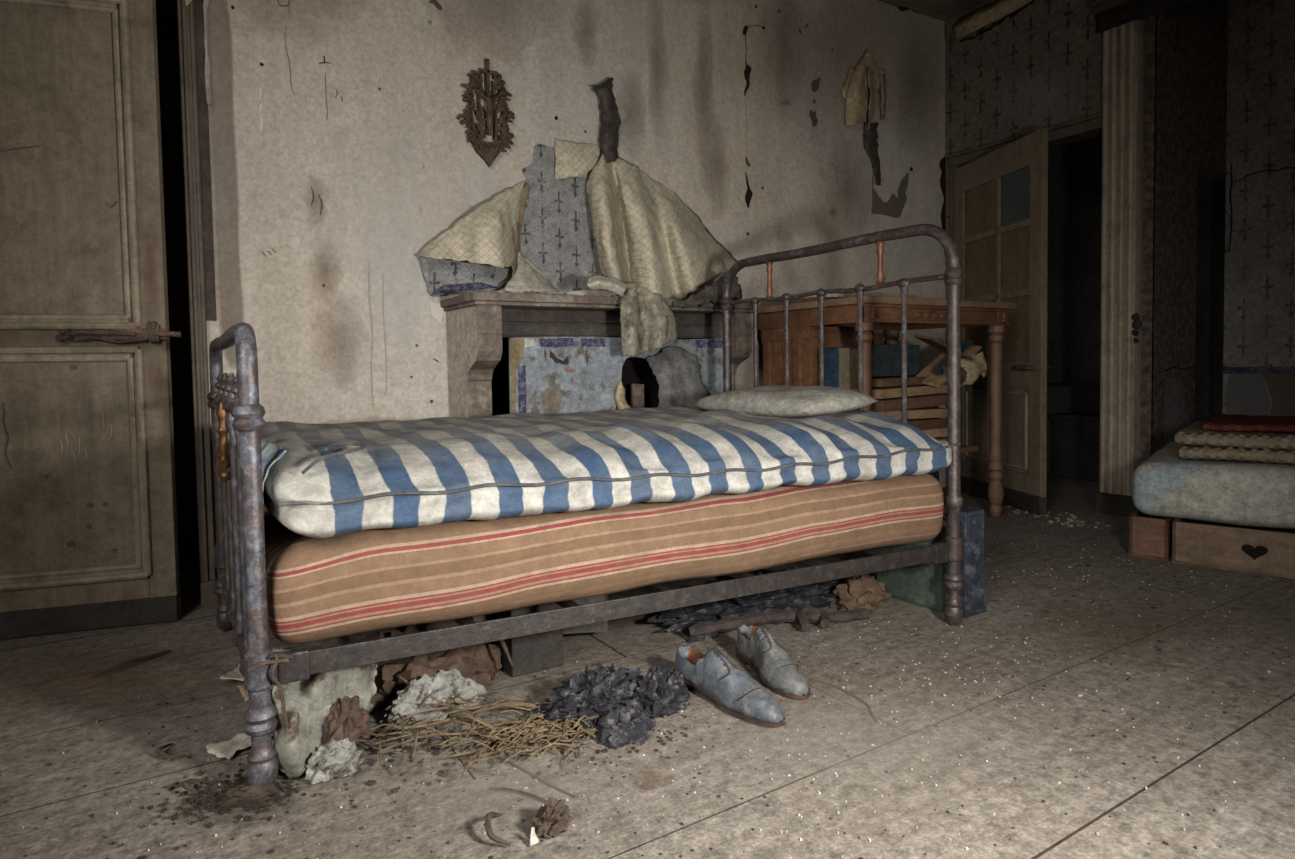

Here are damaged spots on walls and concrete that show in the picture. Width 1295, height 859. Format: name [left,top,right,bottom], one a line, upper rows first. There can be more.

peeling [944,0,1032,41]
flaking render [745,156,764,208]
flaking render [871,172,909,218]